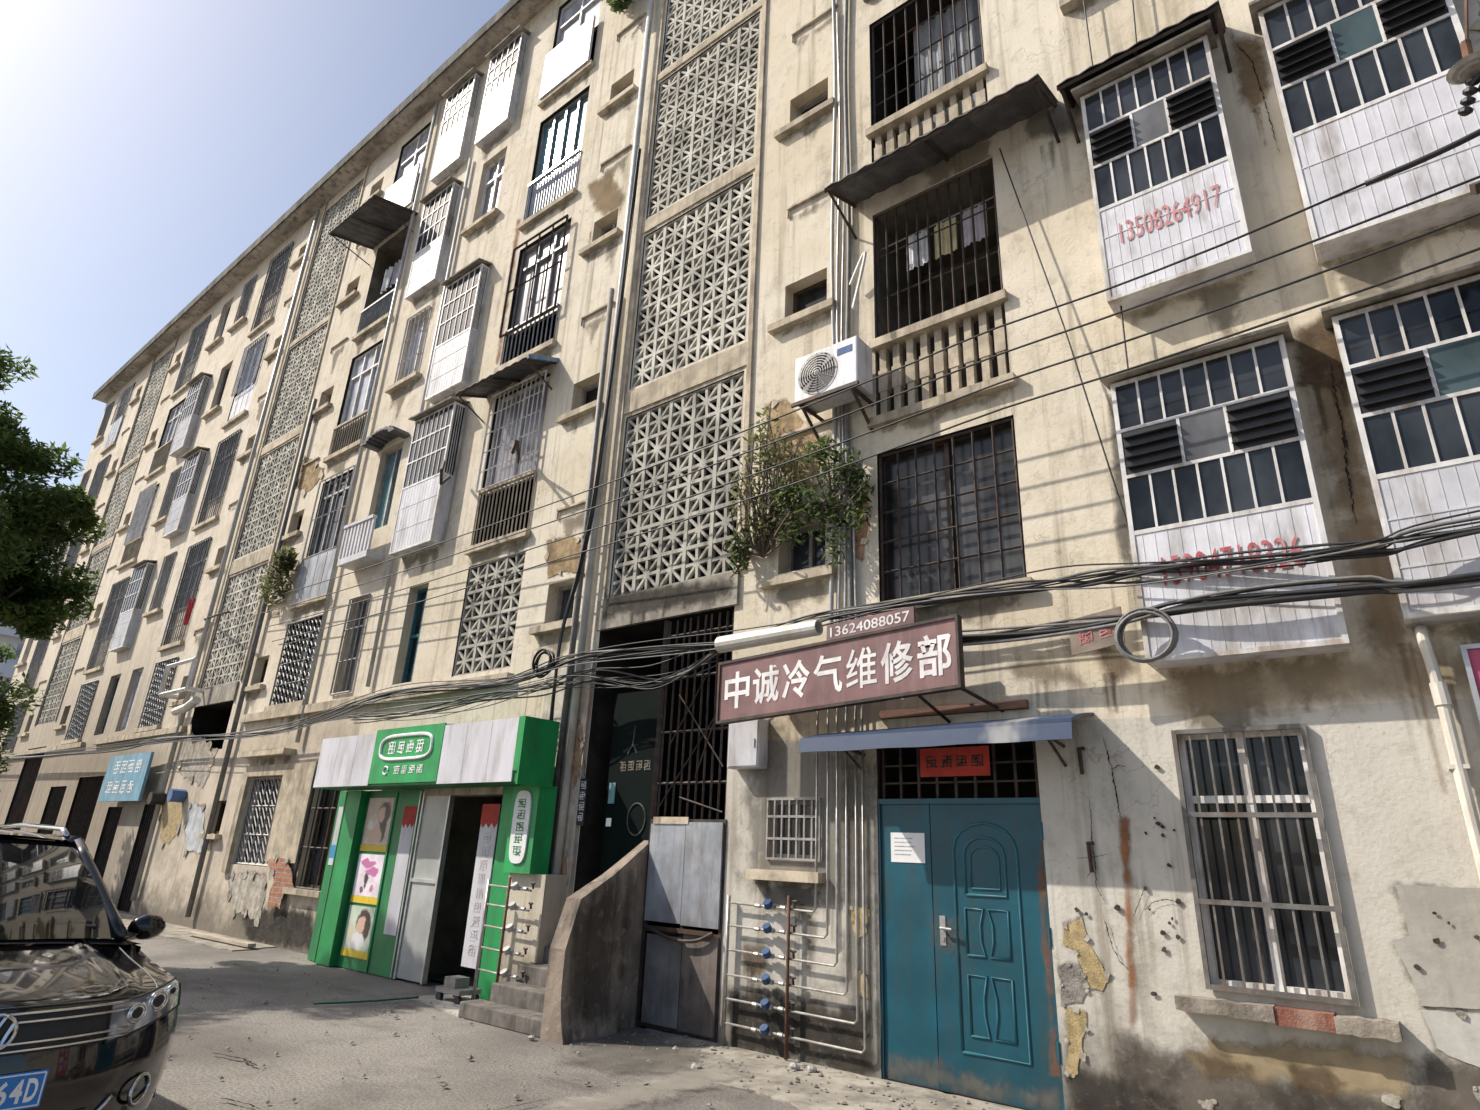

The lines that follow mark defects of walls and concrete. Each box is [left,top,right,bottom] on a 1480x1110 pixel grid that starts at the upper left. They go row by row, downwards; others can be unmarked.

crack [1330,362,1357,523]
peeling [158,723,218,857]
peeling [227,855,295,927]
peeling [1057,907,1110,1078]
rust [1120,818,1133,986]
flaking render [1160,898,1181,953]
leakage [1069,1038,1480,1110]